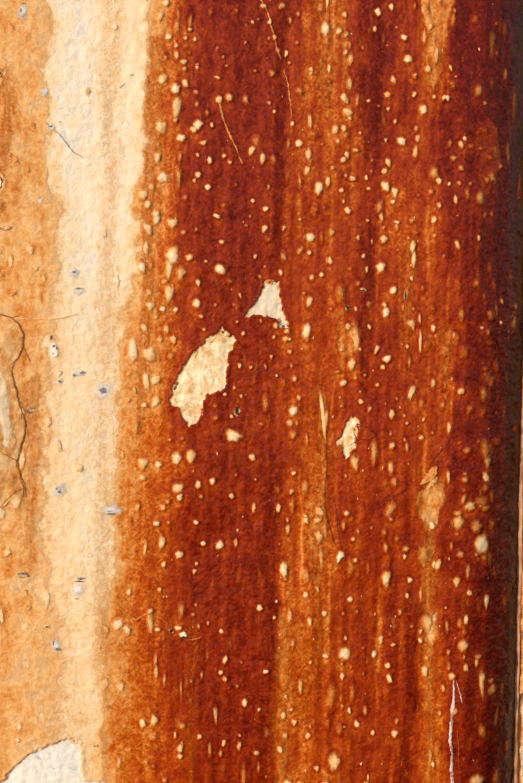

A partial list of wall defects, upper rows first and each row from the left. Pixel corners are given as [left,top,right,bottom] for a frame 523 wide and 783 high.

rust [143,40,161,178]
rust [360,0,381,128]
peeling [245,279,288,328]
rust [358,244,375,347]
rust [0,0,65,783]
crack [0,314,76,507]
peeling [169,326,236,427]
peeling [336,416,376,459]
rust [263,495,276,547]
rust [405,608,418,680]
rust [274,617,293,783]
peeling [1,738,104,783]